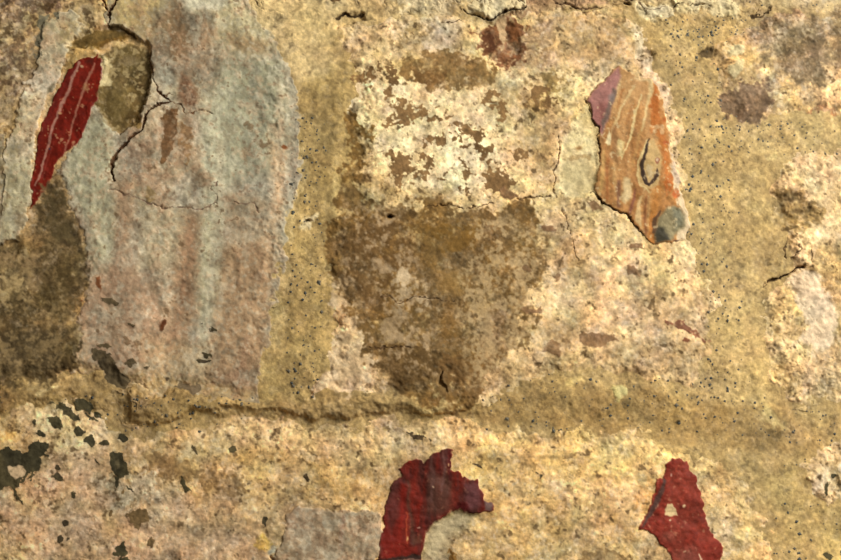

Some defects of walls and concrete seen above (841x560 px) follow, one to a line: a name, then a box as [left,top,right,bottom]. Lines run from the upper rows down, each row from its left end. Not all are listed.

crack [101,0,118,29]
crack [109,51,261,215]
water stain [320,46,562,418]
water stain [0,165,152,411]
water stain [194,349,212,364]
water stain [0,419,64,505]
water stain [46,398,134,494]
water stain [140,443,249,500]
water stain [57,519,71,544]
water stain [125,505,150,531]